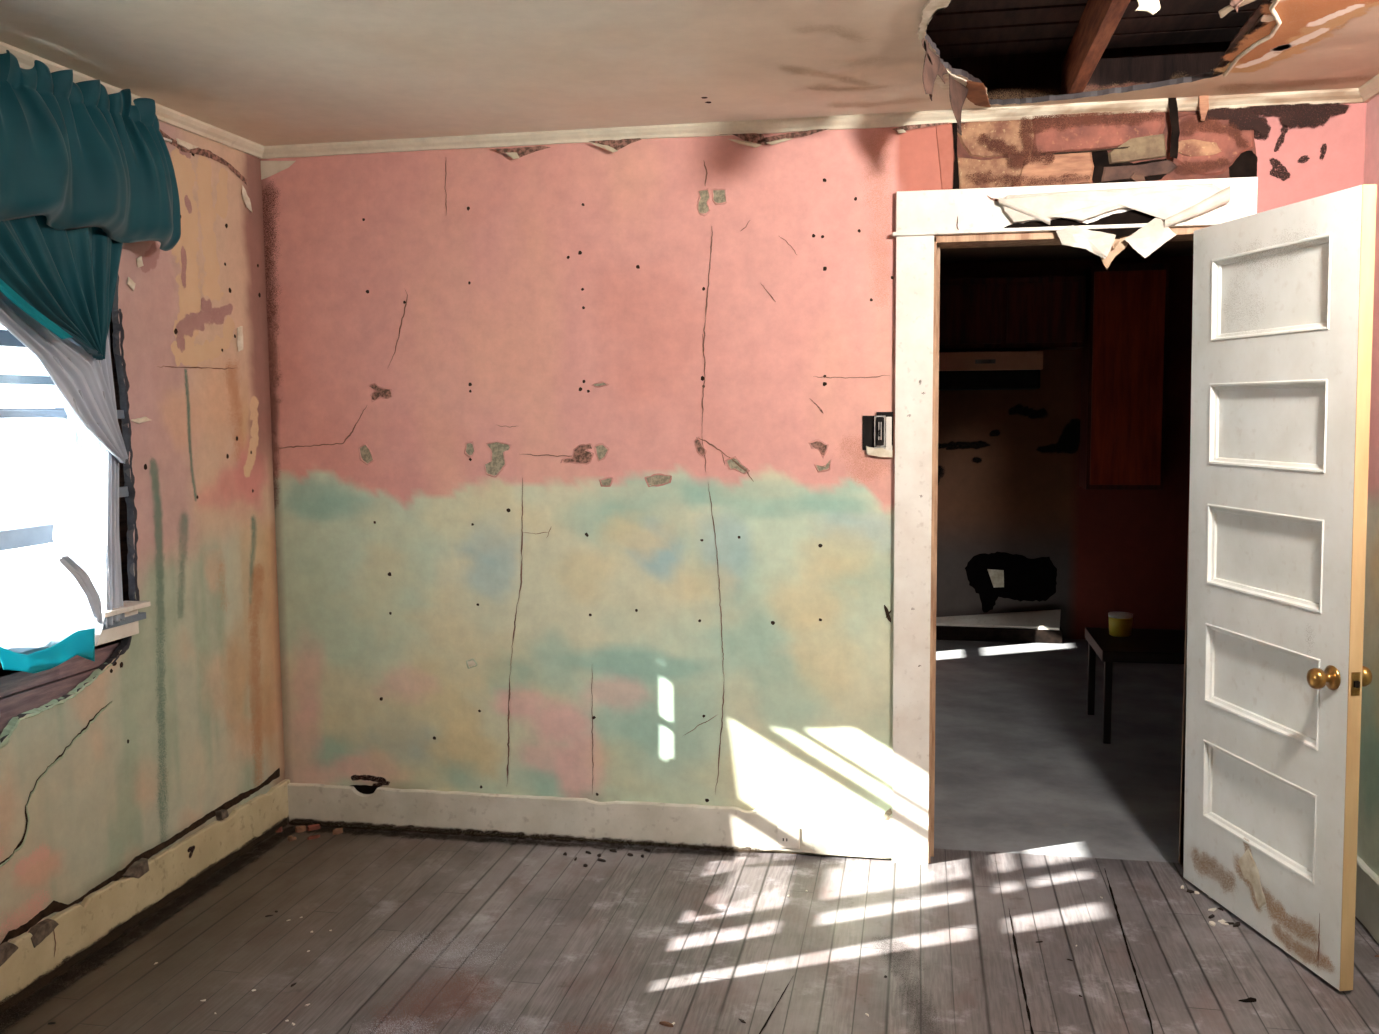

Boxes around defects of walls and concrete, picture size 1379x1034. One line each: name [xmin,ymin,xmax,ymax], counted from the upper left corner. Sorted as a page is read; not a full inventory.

peeling [1214,0,1379,74]
peeling [127,138,252,367]
crack [389,290,408,365]
spalling [0,636,132,749]
spalling [112,308,151,601]
leakage [149,369,197,852]
crack [276,406,367,449]
crack [498,425,579,783]
peeling [560,443,609,465]
crack [683,223,754,792]
spalling [965,552,1057,612]
crack [0,701,113,868]